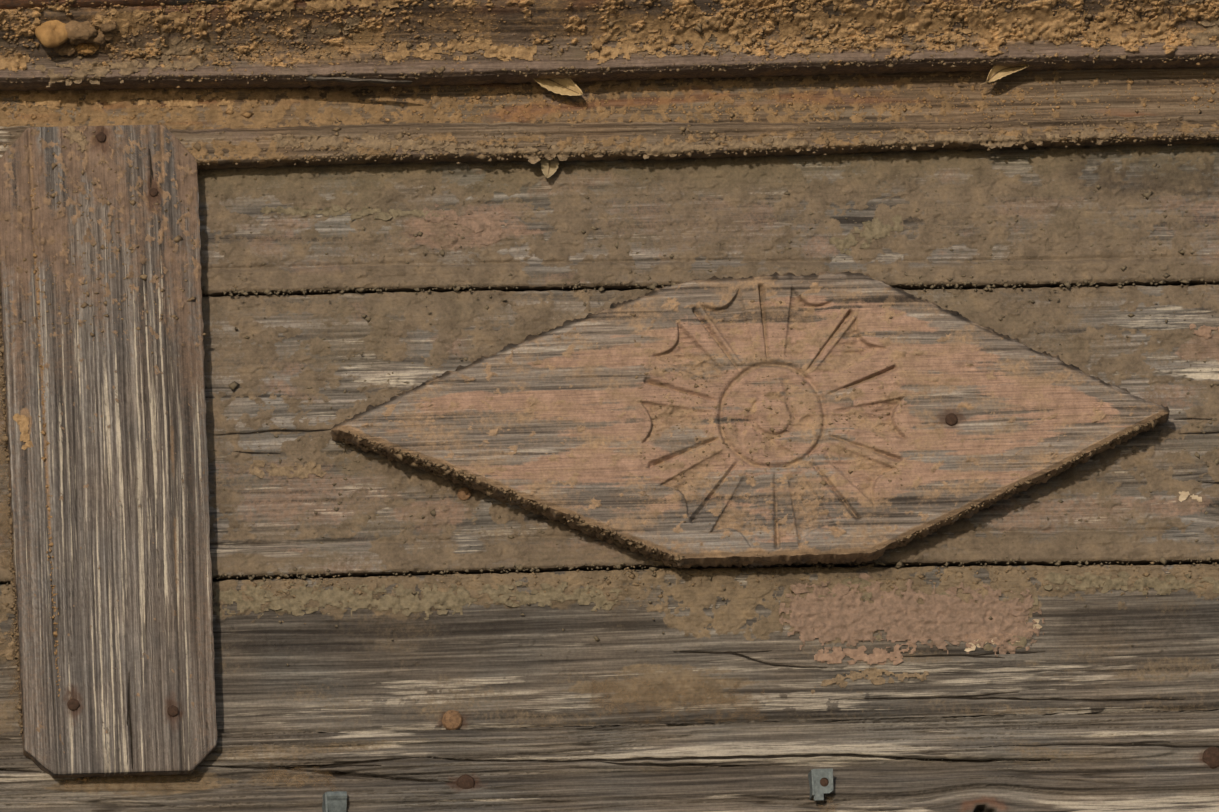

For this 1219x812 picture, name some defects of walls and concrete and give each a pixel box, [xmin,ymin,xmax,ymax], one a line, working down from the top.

peeling [229,0,399,43]
peeling [382,35,537,62]
peeling [587,0,1219,64]
peeling [779,573,1045,694]